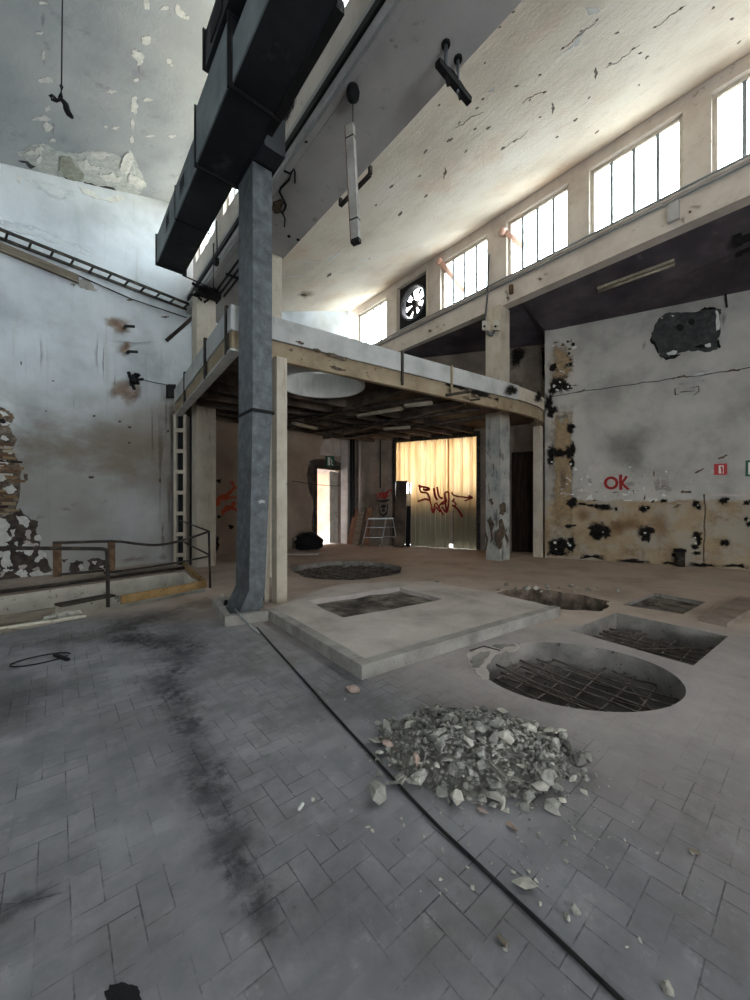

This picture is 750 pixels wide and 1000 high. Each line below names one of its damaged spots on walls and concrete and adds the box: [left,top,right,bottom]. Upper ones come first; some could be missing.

peeling [143,0,189,20]
peeling [131,35,151,66]
peeling [16,96,155,195]
spalling [650,307,722,360]
peeling [549,340,577,389]
peeling [0,407,53,580]
peeling [485,498,508,550]
spalling [466,587,728,712]